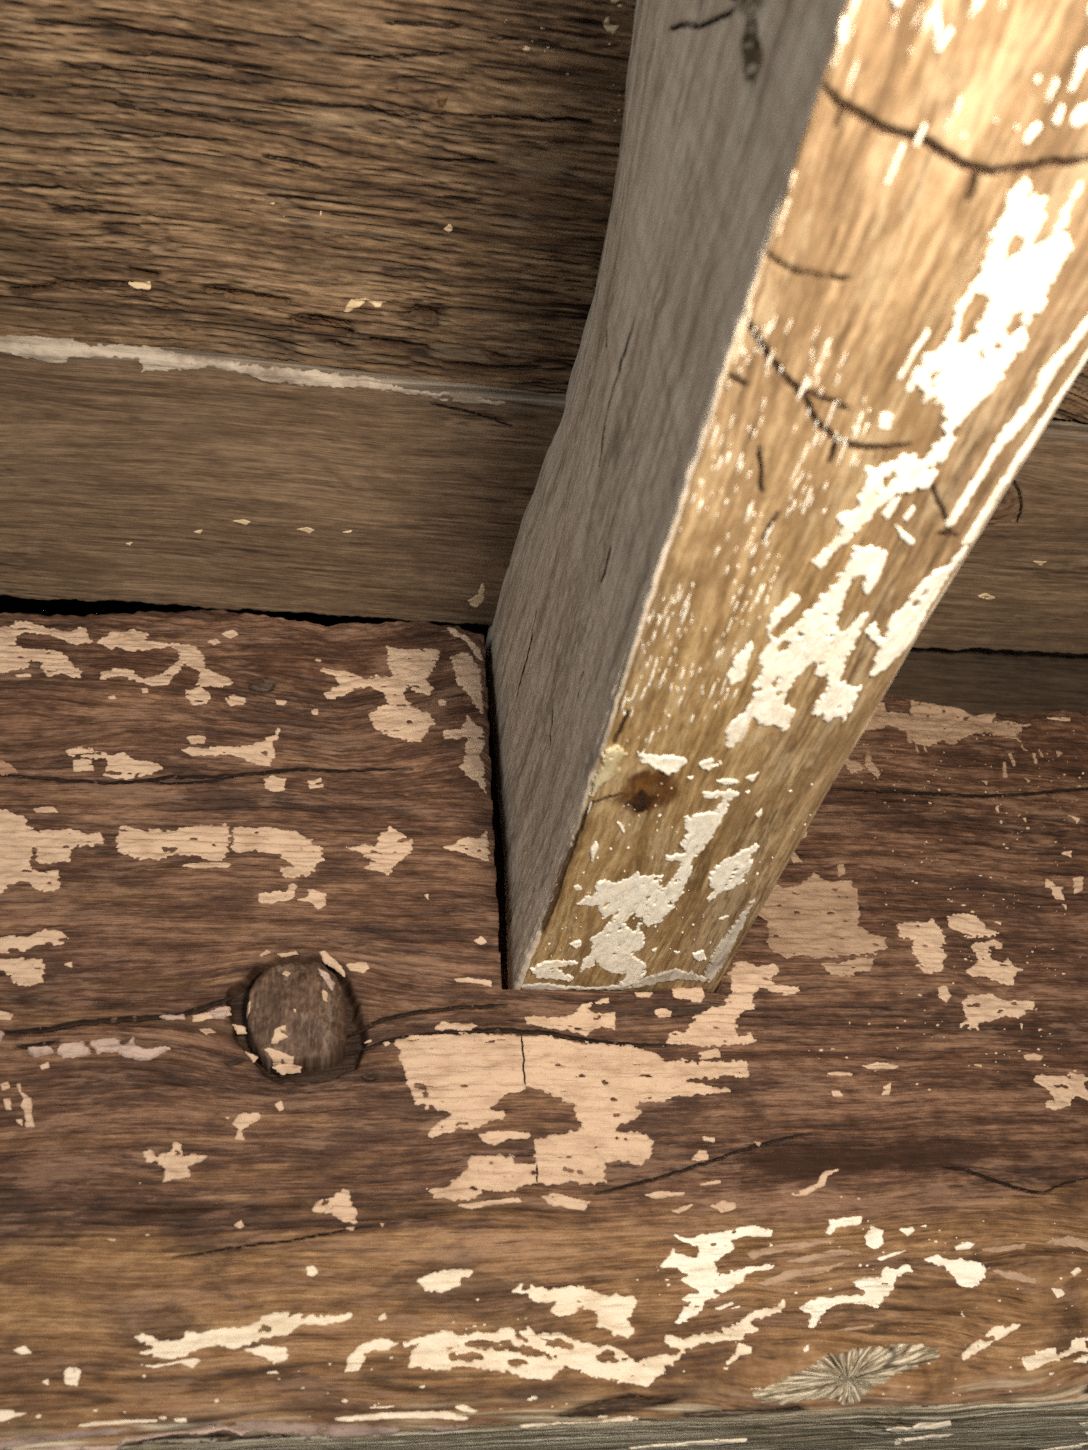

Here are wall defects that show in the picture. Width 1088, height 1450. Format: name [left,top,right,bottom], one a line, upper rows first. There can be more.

peeling [0,620,246,706]
peeling [311,627,487,794]
peeling [365,171,1088,1214]
peeling [66,746,163,780]
peeling [182,728,287,792]
rust [615,771,678,812]
peeling [0,806,327,909]
peeling [0,929,69,986]
crack [5,994,241,1048]
crack [946,1167,1088,1193]
peeling [134,1312,352,1374]
peeling [328,1196,1088,1429]